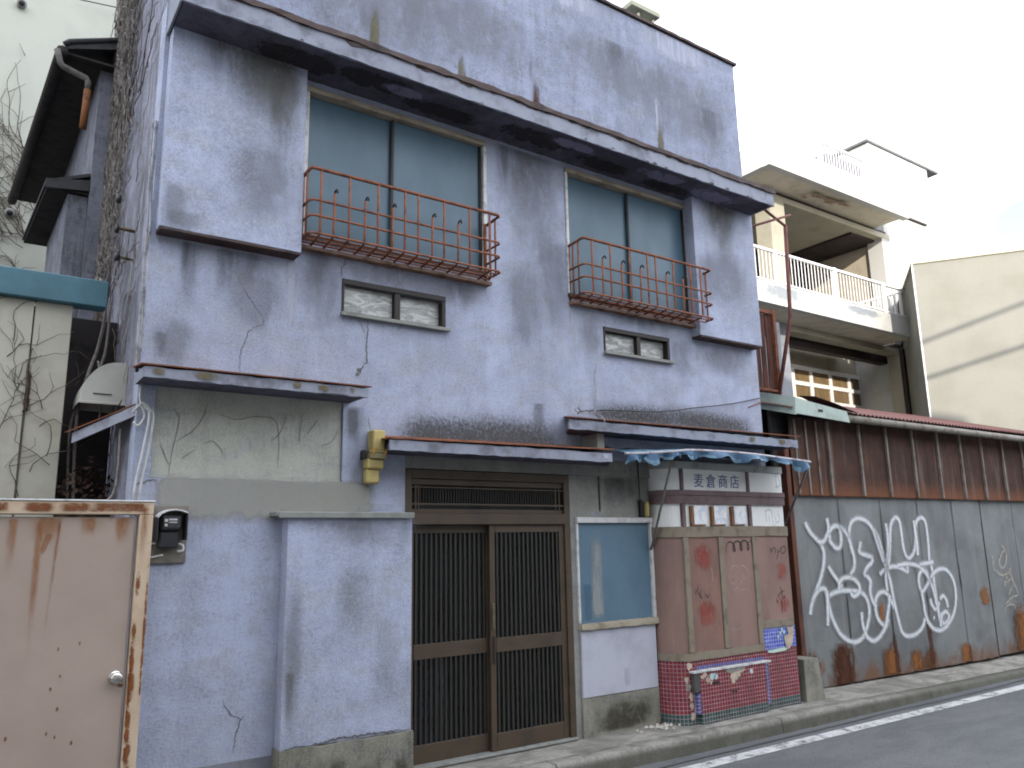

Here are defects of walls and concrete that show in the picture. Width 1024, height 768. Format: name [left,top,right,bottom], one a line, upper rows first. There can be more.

damp [656,32,699,66]
crack [239,282,264,370]
crack [355,320,369,378]
damp [408,421,553,444]
corrosion [0,502,16,539]
corrosion [26,502,146,592]
corrosion [118,579,148,768]
spalling [684,663,753,720]
corrosion [834,645,856,684]
corrosion [884,626,937,675]
corrosion [962,644,973,662]
corrosion [1015,610,1024,650]